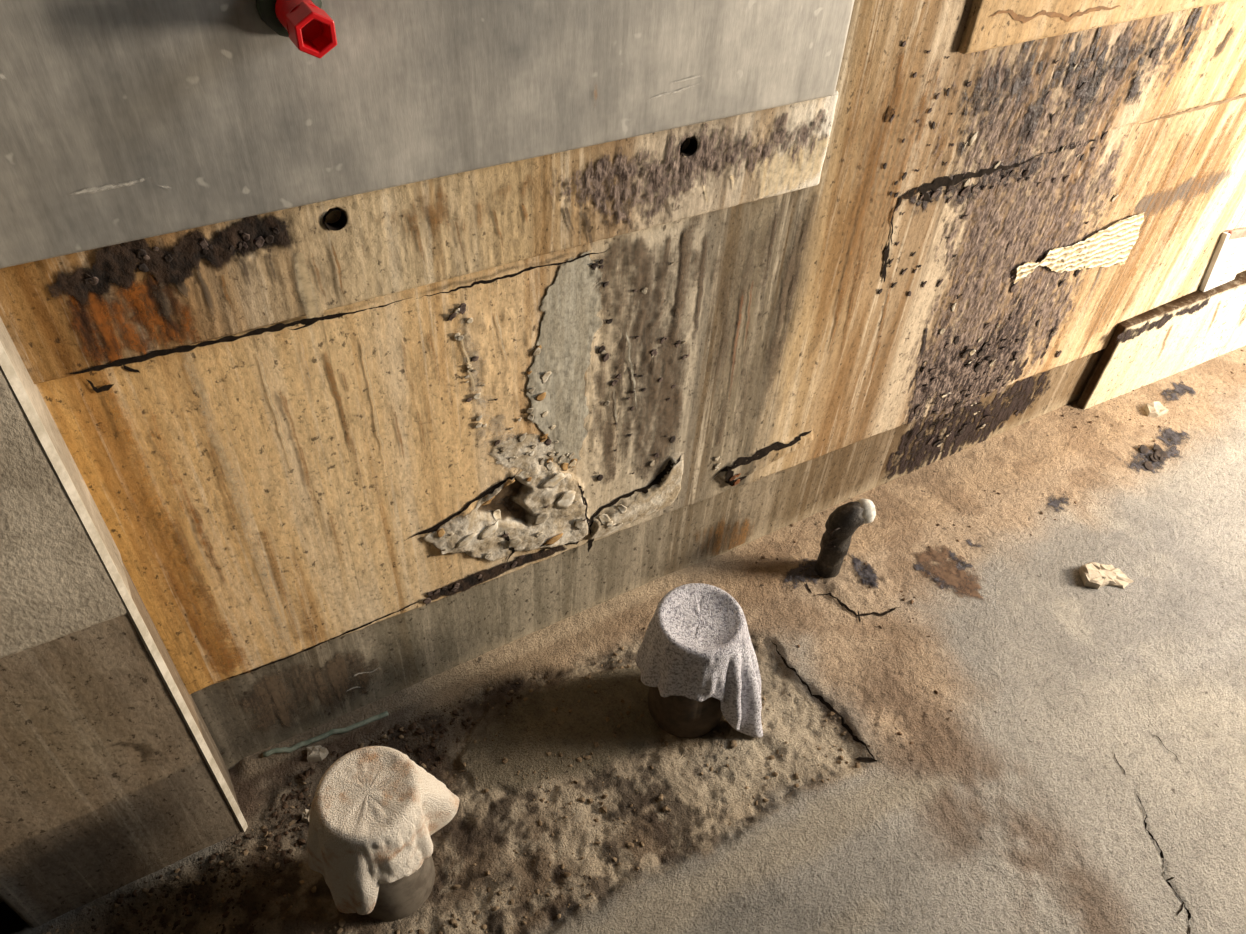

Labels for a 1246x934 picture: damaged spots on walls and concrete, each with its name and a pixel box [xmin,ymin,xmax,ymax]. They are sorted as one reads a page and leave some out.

corrosion [68,275,198,365]
crack [70,245,615,393]
peeling [404,251,603,561]
peeling [626,332,637,409]
damp [550,109,829,481]
crack [714,429,814,486]
damp [830,5,1246,484]
peeling [1014,213,1144,284]
crack [771,641,877,762]
crack [1114,753,1191,934]